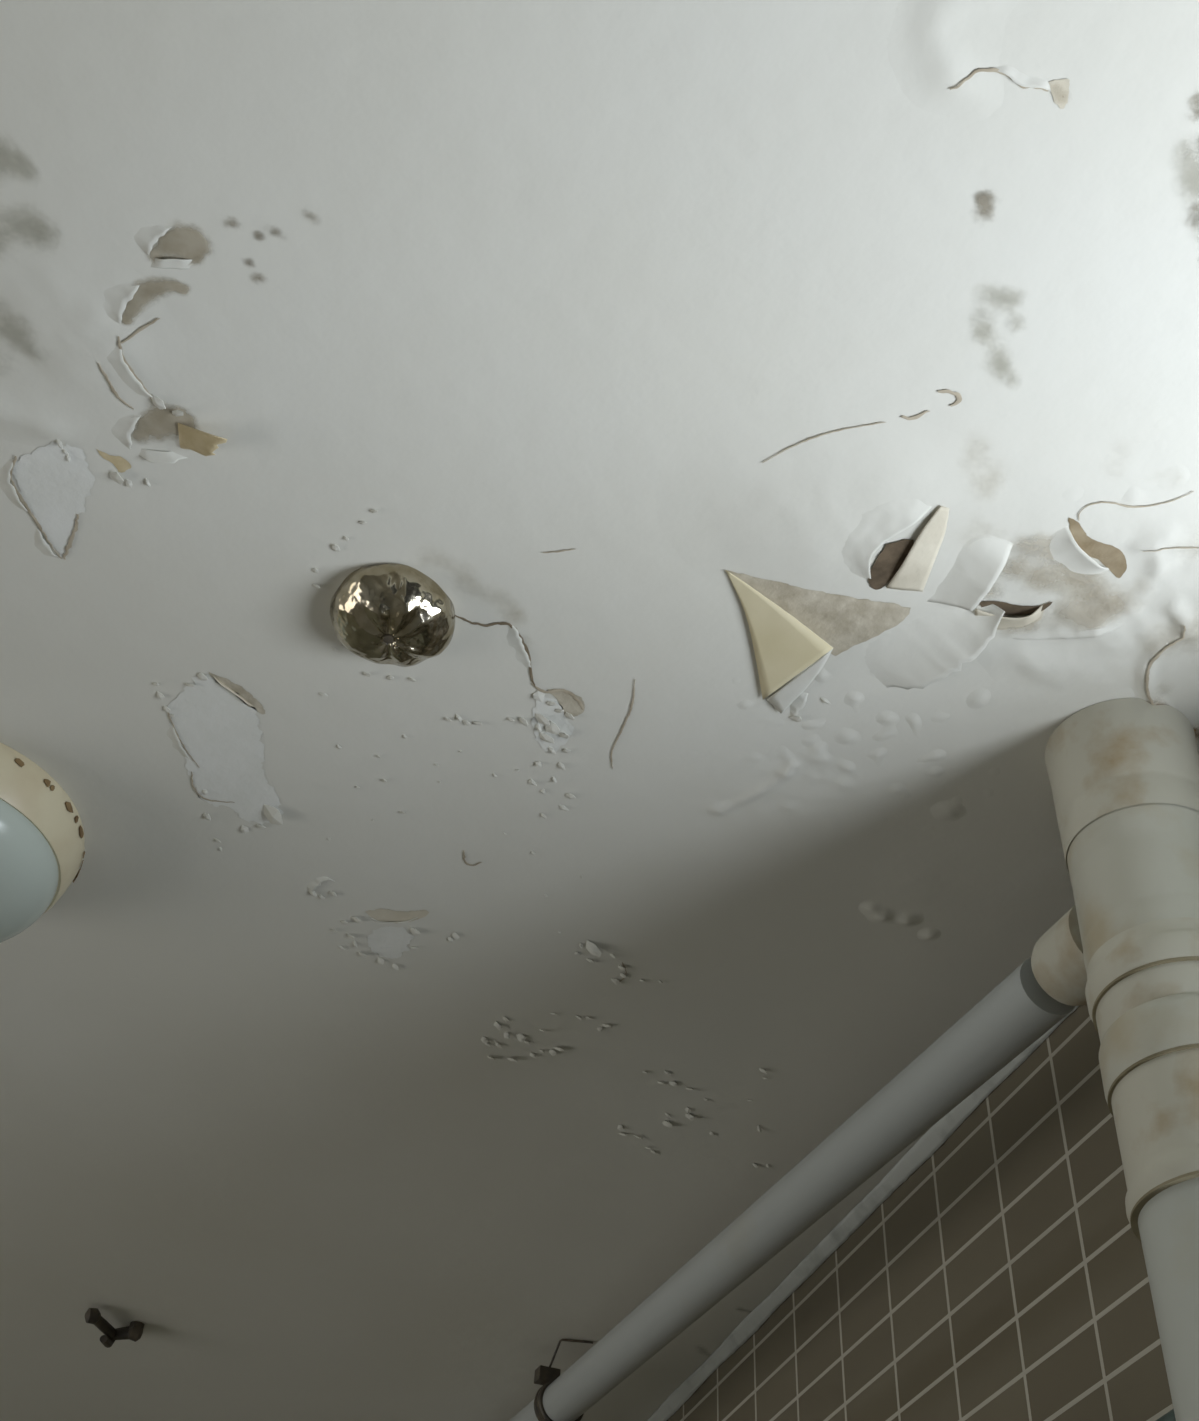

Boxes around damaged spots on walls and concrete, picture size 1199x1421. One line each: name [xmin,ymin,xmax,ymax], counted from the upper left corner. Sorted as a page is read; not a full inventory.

crack [950,65,1070,109]
leakage [977,193,993,214]
peeling [0,225,227,560]
crack [762,390,962,463]
peeling [726,491,1194,722]
peeling [153,672,284,834]
crack [445,615,585,819]
crack [610,679,636,769]
peeling [331,908,429,970]